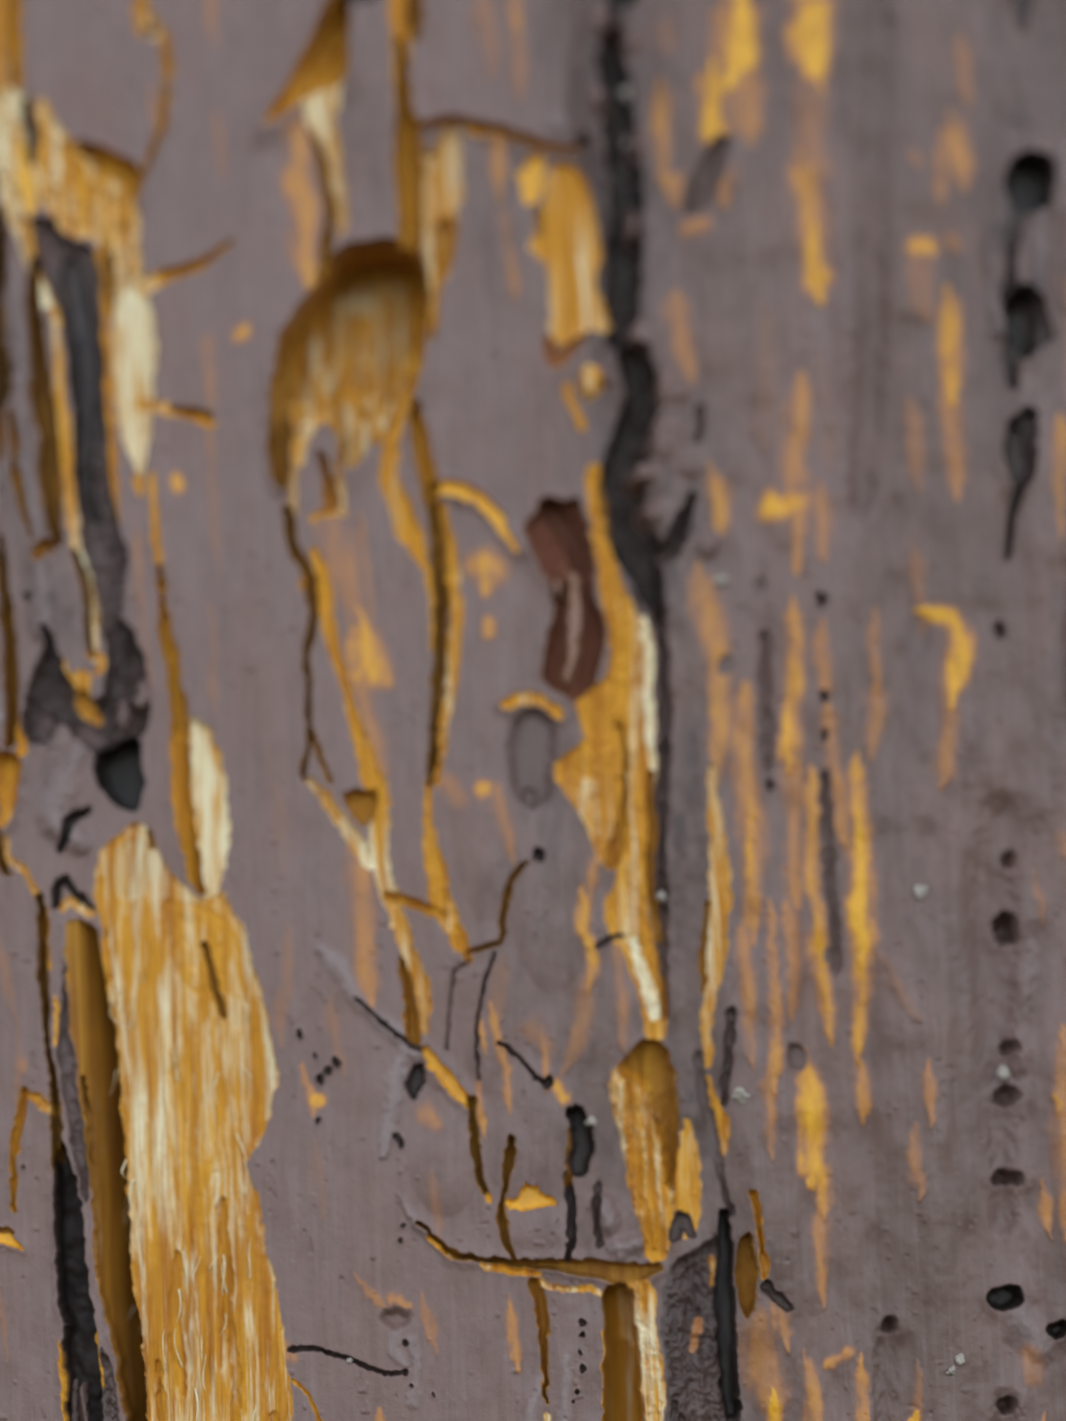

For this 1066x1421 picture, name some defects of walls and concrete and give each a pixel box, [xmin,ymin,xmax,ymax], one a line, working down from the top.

peeling [0,0,296,1421]
peeling [262,0,741,1421]
crack [415,858,797,1421]